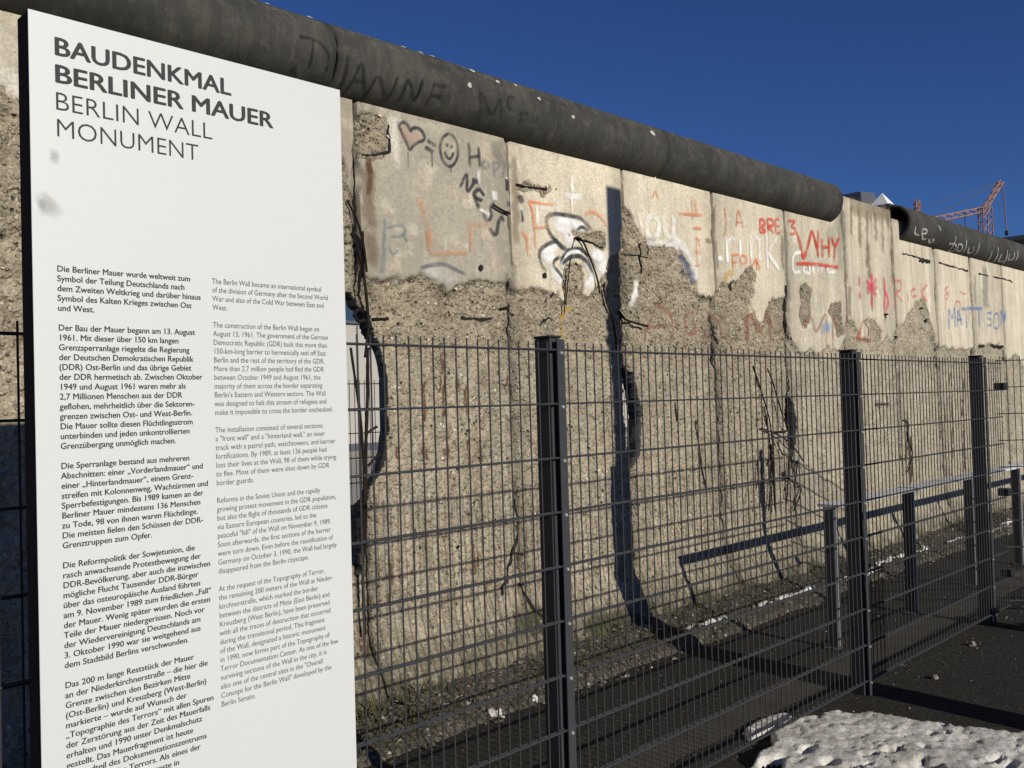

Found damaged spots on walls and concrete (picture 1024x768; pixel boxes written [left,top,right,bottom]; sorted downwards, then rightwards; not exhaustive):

crack [501,478,543,618]
spalling [341,111,1024,712]